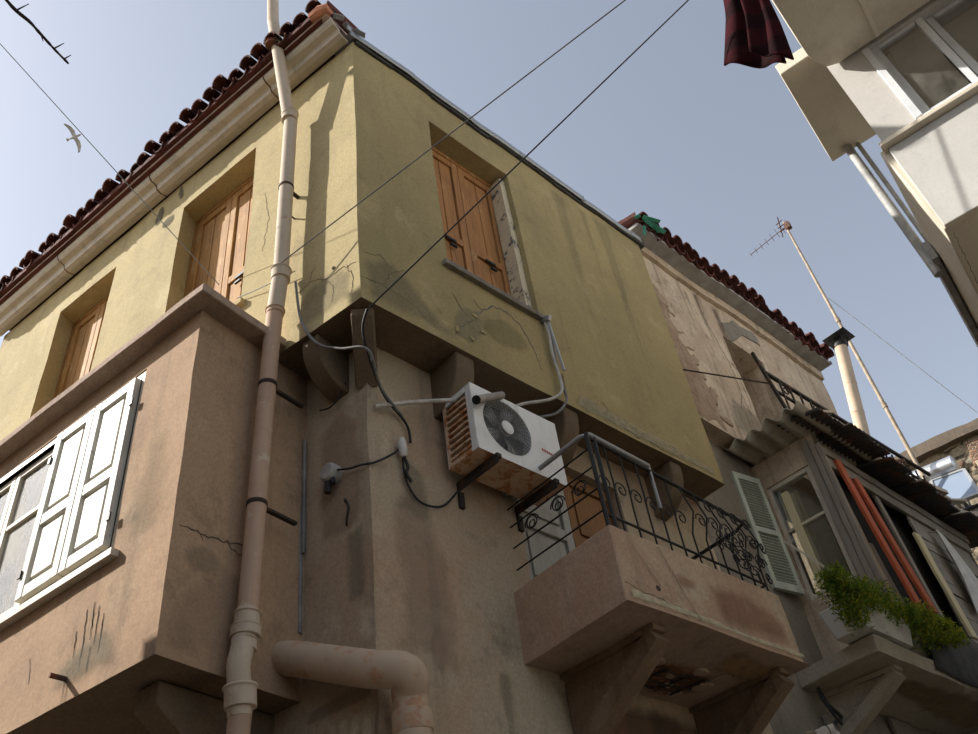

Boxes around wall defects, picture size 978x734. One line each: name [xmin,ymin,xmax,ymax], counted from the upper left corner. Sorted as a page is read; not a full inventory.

crack [298,253,412,304]
crack [452,293,541,368]
peeling [654,289,734,427]
spalling [721,321,760,346]
crack [181,525,243,556]